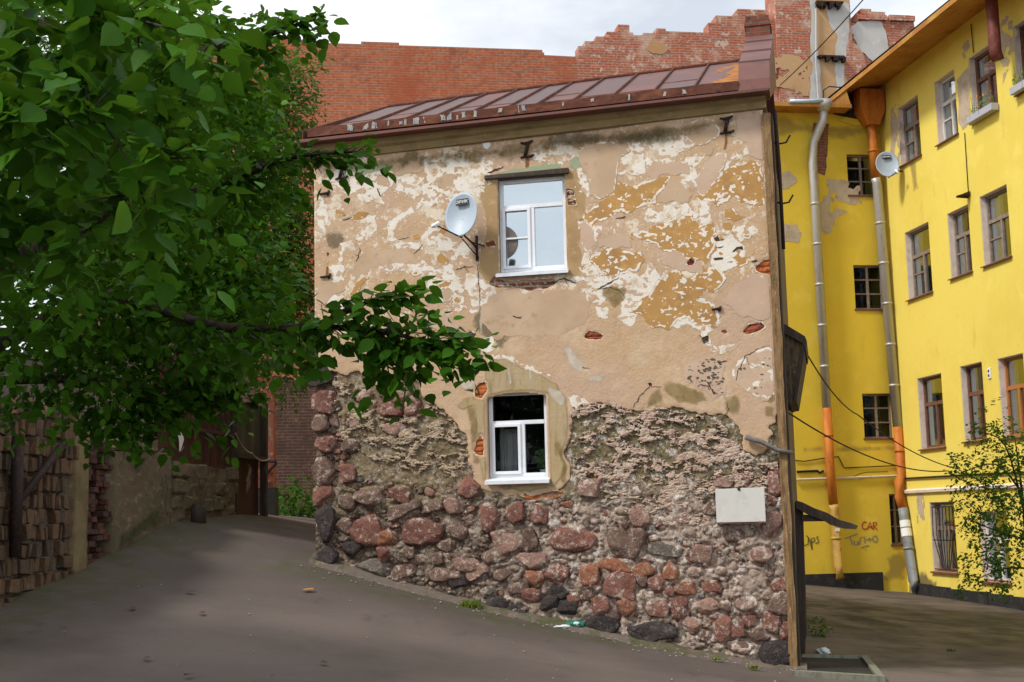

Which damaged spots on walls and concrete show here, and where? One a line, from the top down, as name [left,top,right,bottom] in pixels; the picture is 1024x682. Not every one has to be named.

peeling [775,0,889,99]
damp [327,234,343,248]
peeling [314,142,555,314]
peeling [531,134,774,401]
peeling [811,123,862,235]
crack [699,335,769,422]
flaking render [307,367,790,666]